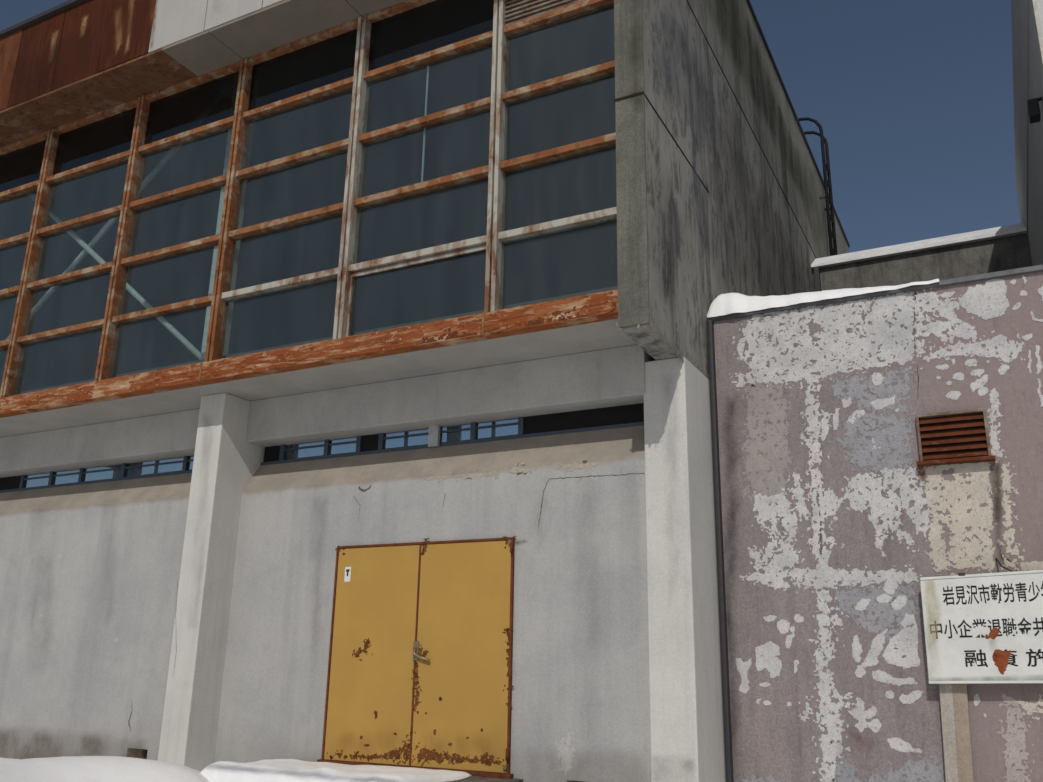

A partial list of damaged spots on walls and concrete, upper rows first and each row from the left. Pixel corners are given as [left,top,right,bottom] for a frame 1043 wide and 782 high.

water stain [717,0,782,131]
rust [128,291,617,392]
crack [538,473,644,528]
peeling [729,275,1043,782]
rust [352,637,373,661]
rust [411,645,429,714]
rust [502,627,514,708]
rust [327,731,504,766]